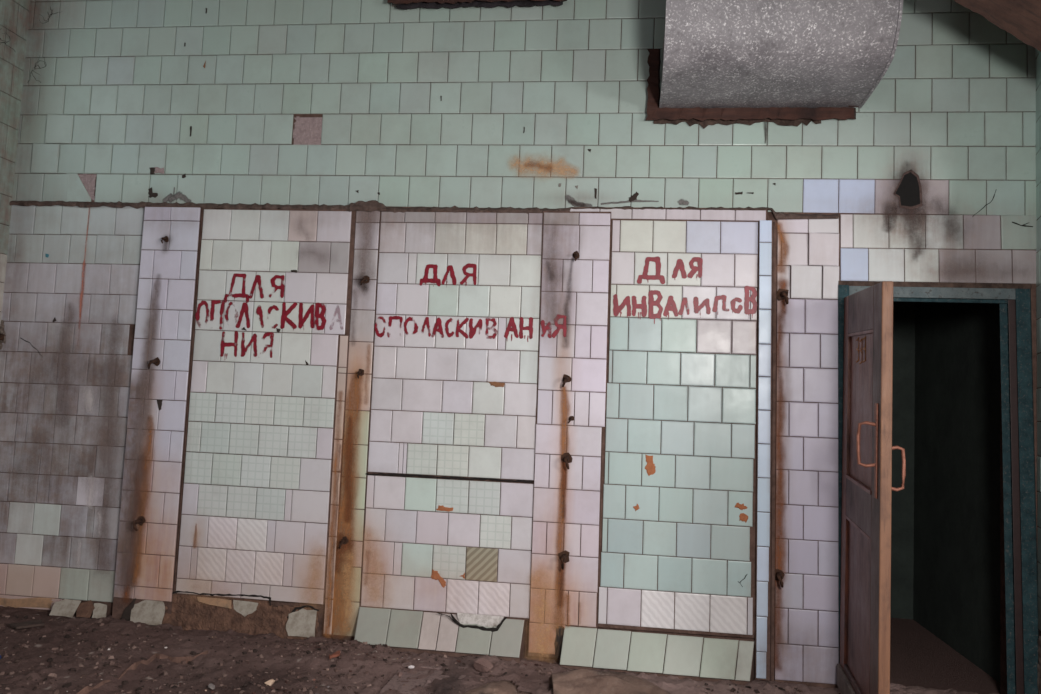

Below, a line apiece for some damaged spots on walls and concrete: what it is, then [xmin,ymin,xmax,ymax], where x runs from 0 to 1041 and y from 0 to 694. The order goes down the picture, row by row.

spalling [78,174,97,200]
spalling [293,116,323,145]
rust [124,417,152,600]
rust [324,372,362,636]
rust [536,387,569,655]